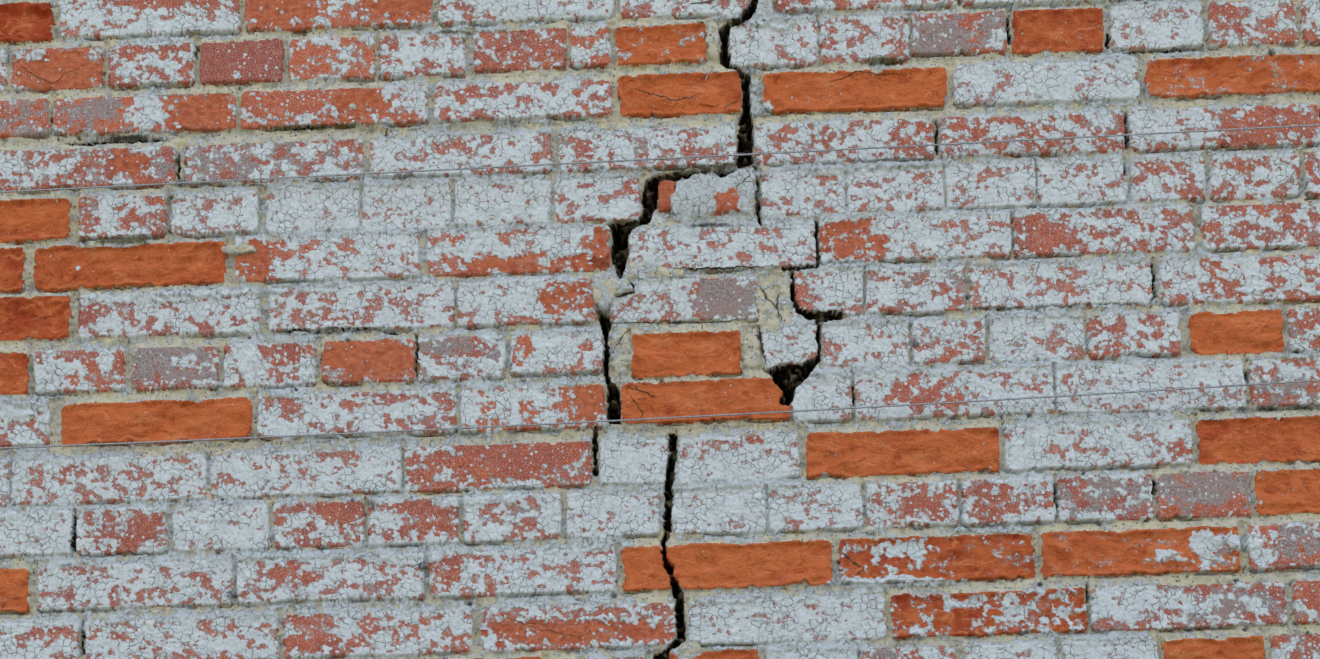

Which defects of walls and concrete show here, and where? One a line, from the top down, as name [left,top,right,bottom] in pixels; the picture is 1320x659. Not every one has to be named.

crack [592,0,842,476]
crack [654,433,686,659]